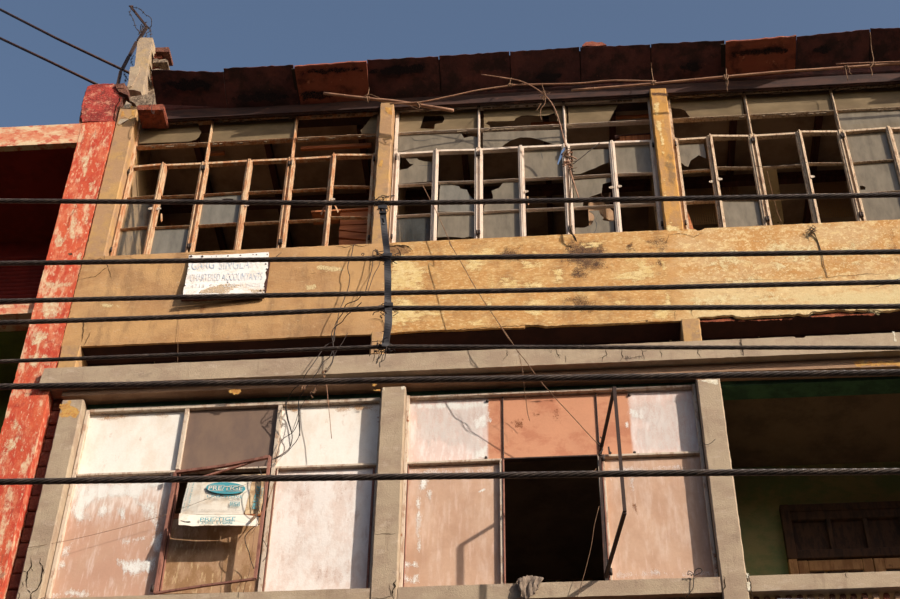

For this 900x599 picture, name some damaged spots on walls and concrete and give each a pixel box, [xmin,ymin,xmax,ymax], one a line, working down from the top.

peeling [51,209,90,273]
crack [56,157,133,366]
leakage [560,238,615,278]
peeling [37,281,72,319]
peeling [29,329,50,369]
peeling [59,400,80,418]